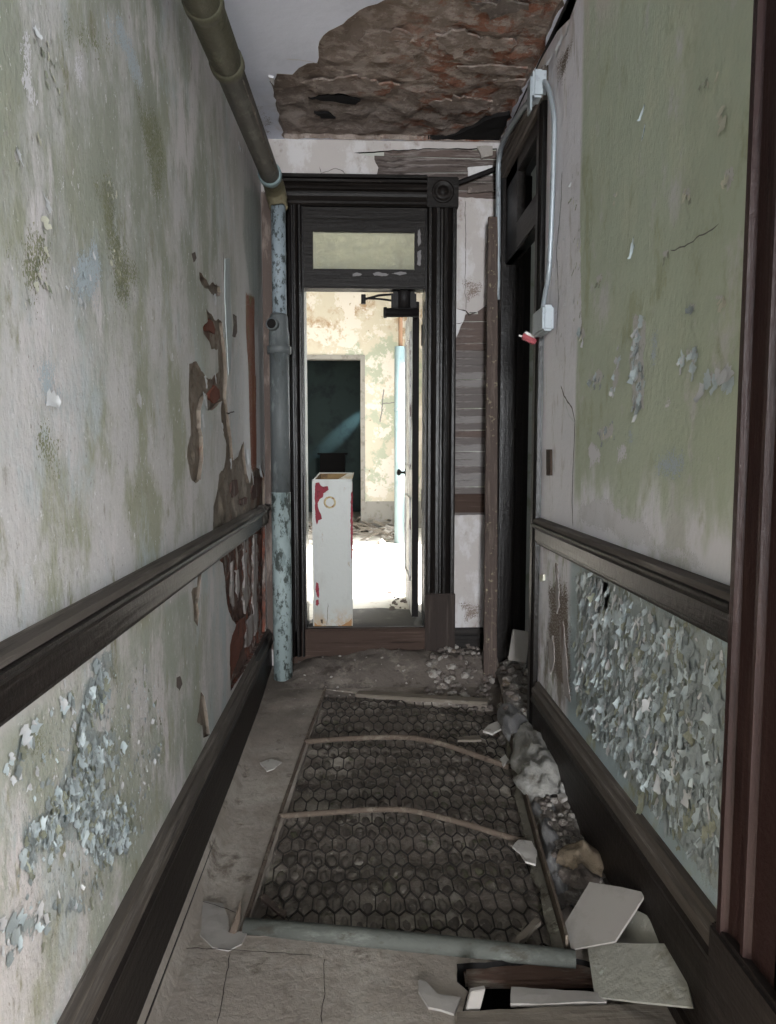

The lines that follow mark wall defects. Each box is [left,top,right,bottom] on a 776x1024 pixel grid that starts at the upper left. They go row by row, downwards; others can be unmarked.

flaking render [271,0,572,142]
crack [671,225,717,251]
flaking render [187,252,265,530]
crack [561,387,575,523]
peeling [609,314,647,423]
peeling [676,347,734,403]
flaking render [191,575,201,626]
flaking render [220,526,266,690]
peeling [539,563,727,892]
peeling [0,645,166,968]
hole [457,959,594,1011]